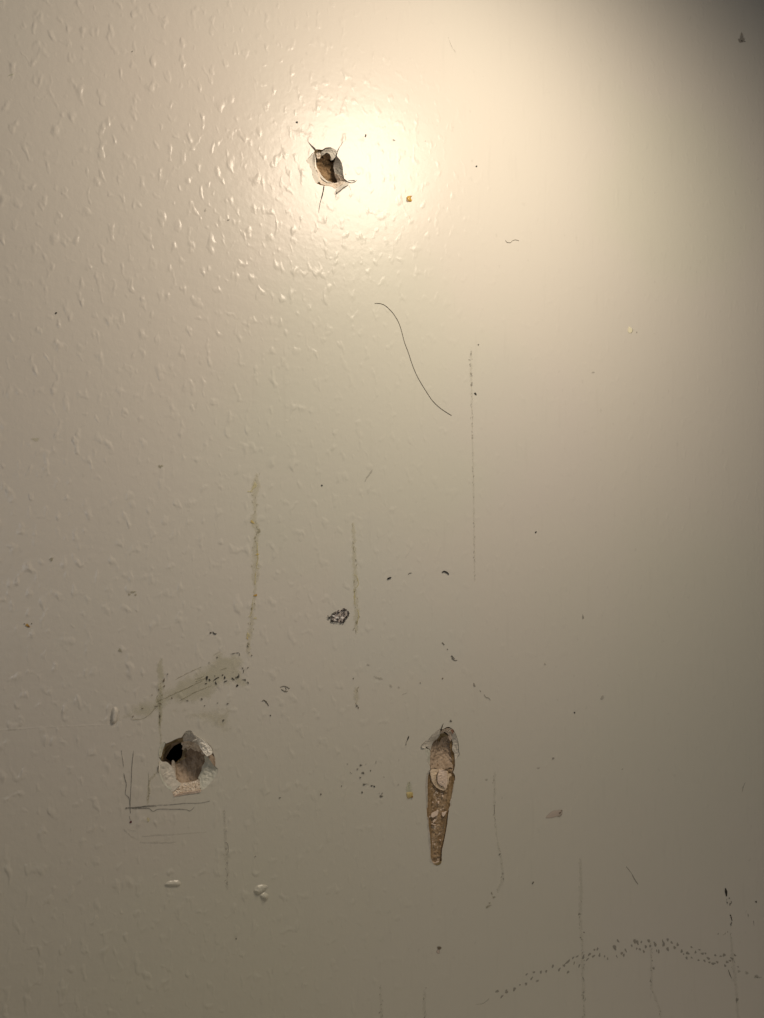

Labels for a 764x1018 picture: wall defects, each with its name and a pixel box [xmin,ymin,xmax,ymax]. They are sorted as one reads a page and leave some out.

peeling [193,733,213,756]
peeling [425,768,455,865]